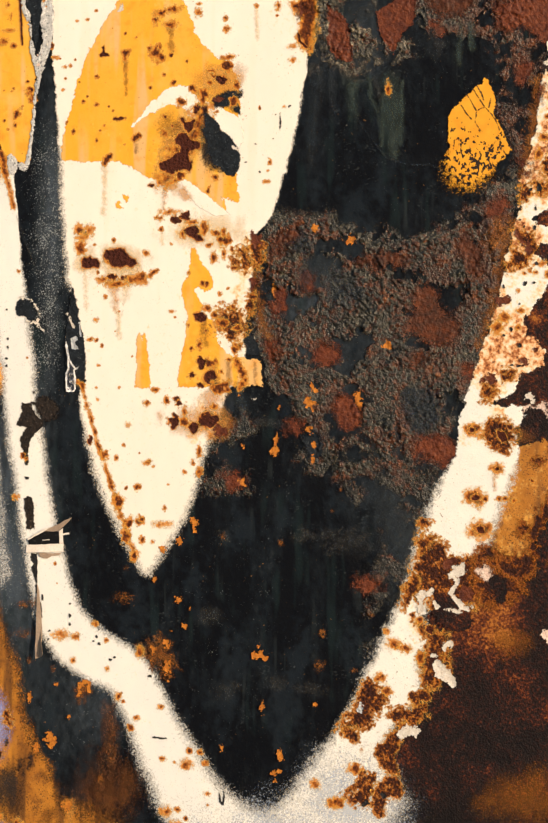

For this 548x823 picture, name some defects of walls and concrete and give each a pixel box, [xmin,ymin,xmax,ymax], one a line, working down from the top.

rust [152,5,182,29]
rust [147,42,177,86]
rust [81,95,126,142]
peeling [60,0,243,216]
rust [148,54,241,192]
crack [461,85,500,131]
rust [74,222,160,299]
rust [463,133,548,474]
peeling [16,391,60,465]
rust [139,505,172,528]
rust [135,631,179,682]
rust [327,487,548,823]